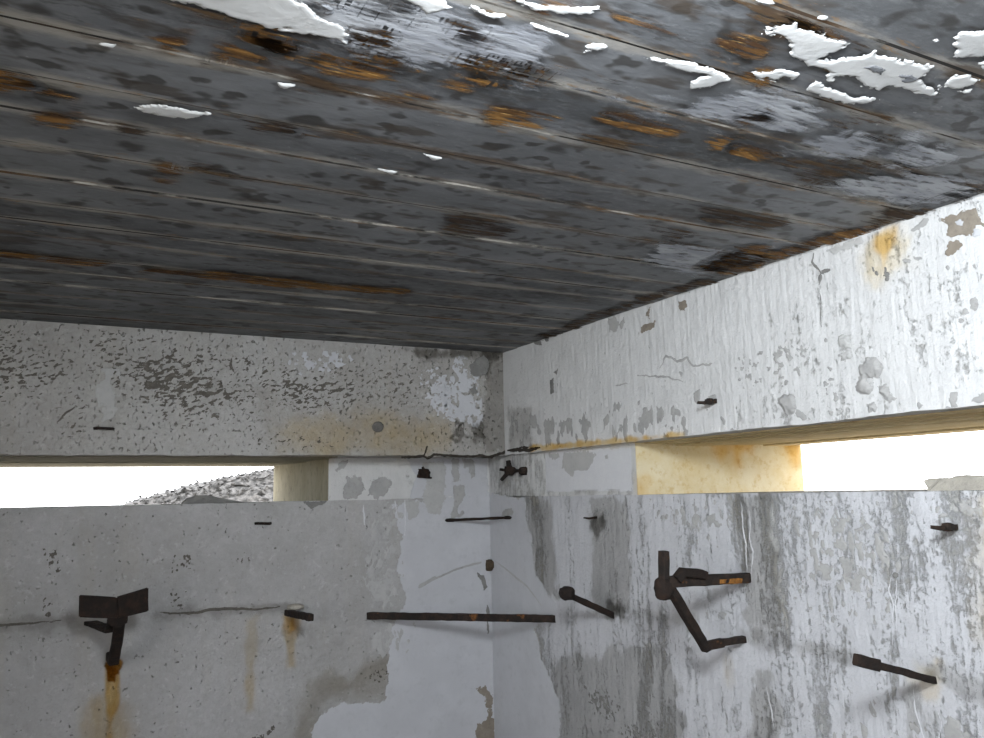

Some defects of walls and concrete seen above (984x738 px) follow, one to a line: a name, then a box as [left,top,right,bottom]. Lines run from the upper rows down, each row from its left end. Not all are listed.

peeling [171,0,350,44]
peeling [407,0,453,14]
peeling [469,5,506,19]
peeling [530,23,569,38]
peeling [516,0,600,15]
peeling [646,57,731,89]
peeling [751,15,984,104]
peeling [911,208,984,270]
peeling [77,324,456,449]
crack [401,446,540,460]
water stain [741,504,754,575]
rust [105,659,122,682]